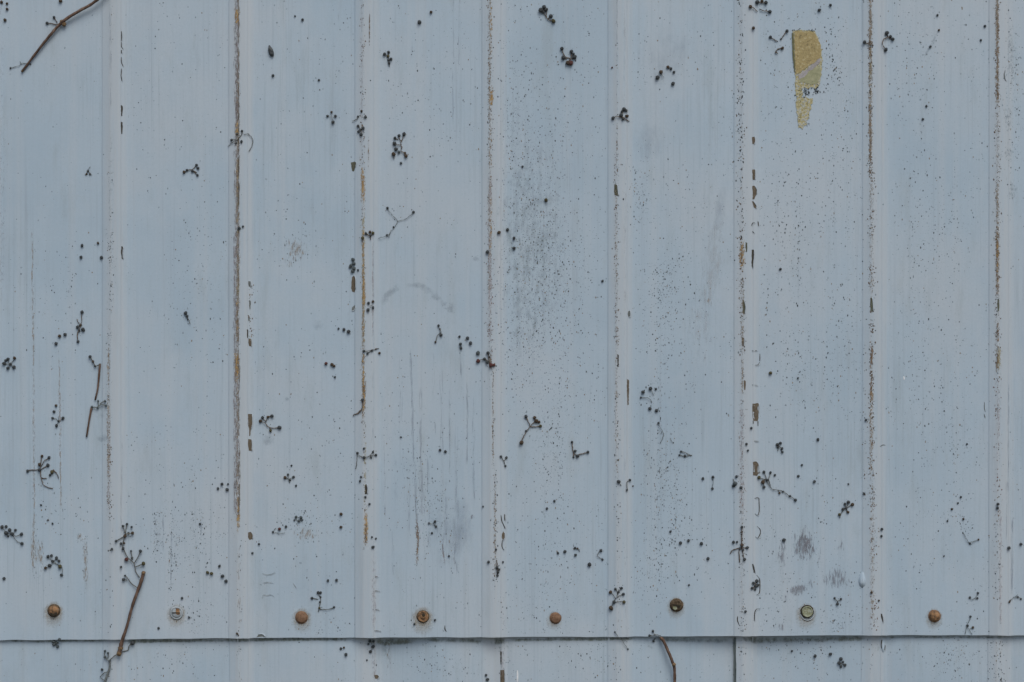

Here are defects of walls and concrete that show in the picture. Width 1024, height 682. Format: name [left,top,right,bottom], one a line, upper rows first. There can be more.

corrosion [231,0,256,547]
corrosion [359,82,369,545]
corrosion [992,0,1004,600]